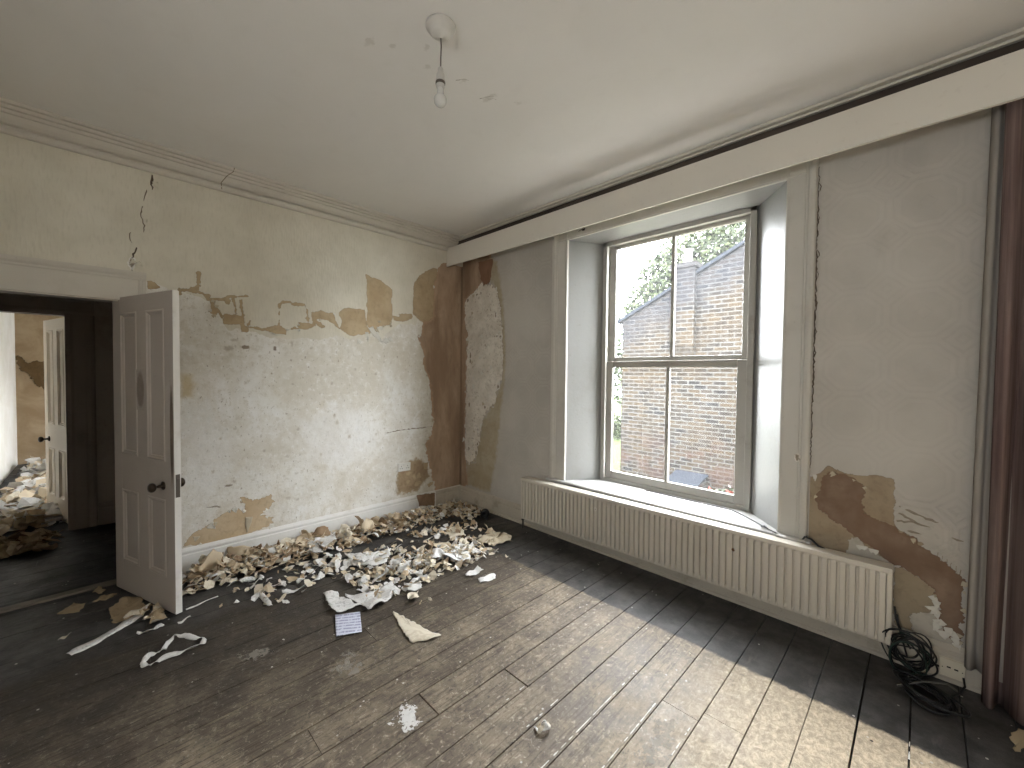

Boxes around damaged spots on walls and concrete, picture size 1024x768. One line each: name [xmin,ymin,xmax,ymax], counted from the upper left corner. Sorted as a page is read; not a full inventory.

crack [127,175,159,270]
peeling [177,268,437,367]
crack [810,167,822,465]
peeling [462,282,504,465]
peeling [183,480,300,547]
peeling [809,466,924,559]
peeling [892,567,961,650]